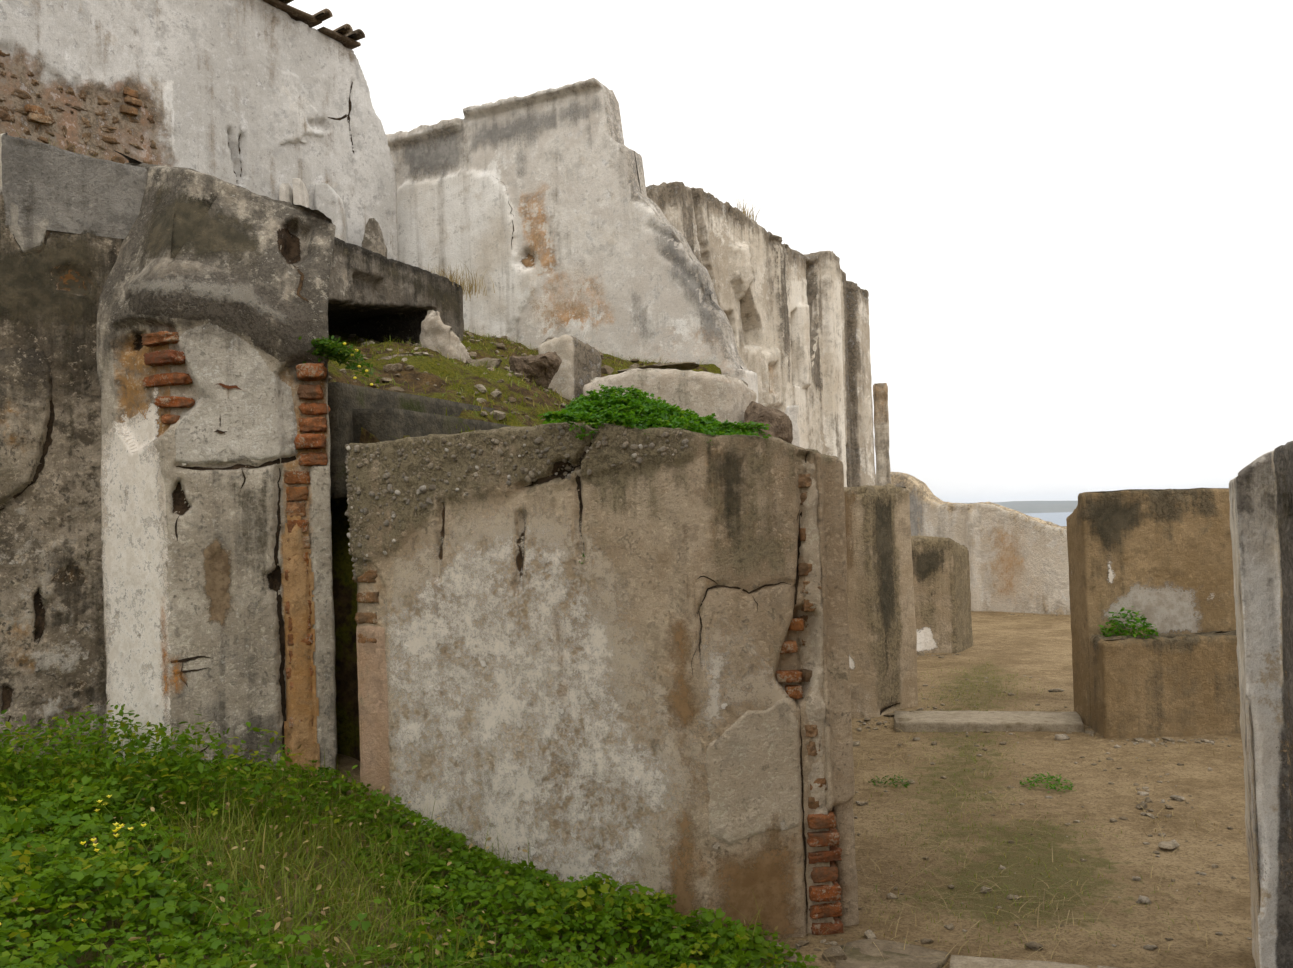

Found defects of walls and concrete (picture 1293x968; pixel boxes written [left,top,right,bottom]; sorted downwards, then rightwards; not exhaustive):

peeling [120,87,142,117]
spalling [538,334,757,424]
peeling [100,323,330,776]
peeling [345,425,844,935]
crack [691,510,802,673]
crack [800,716,808,914]